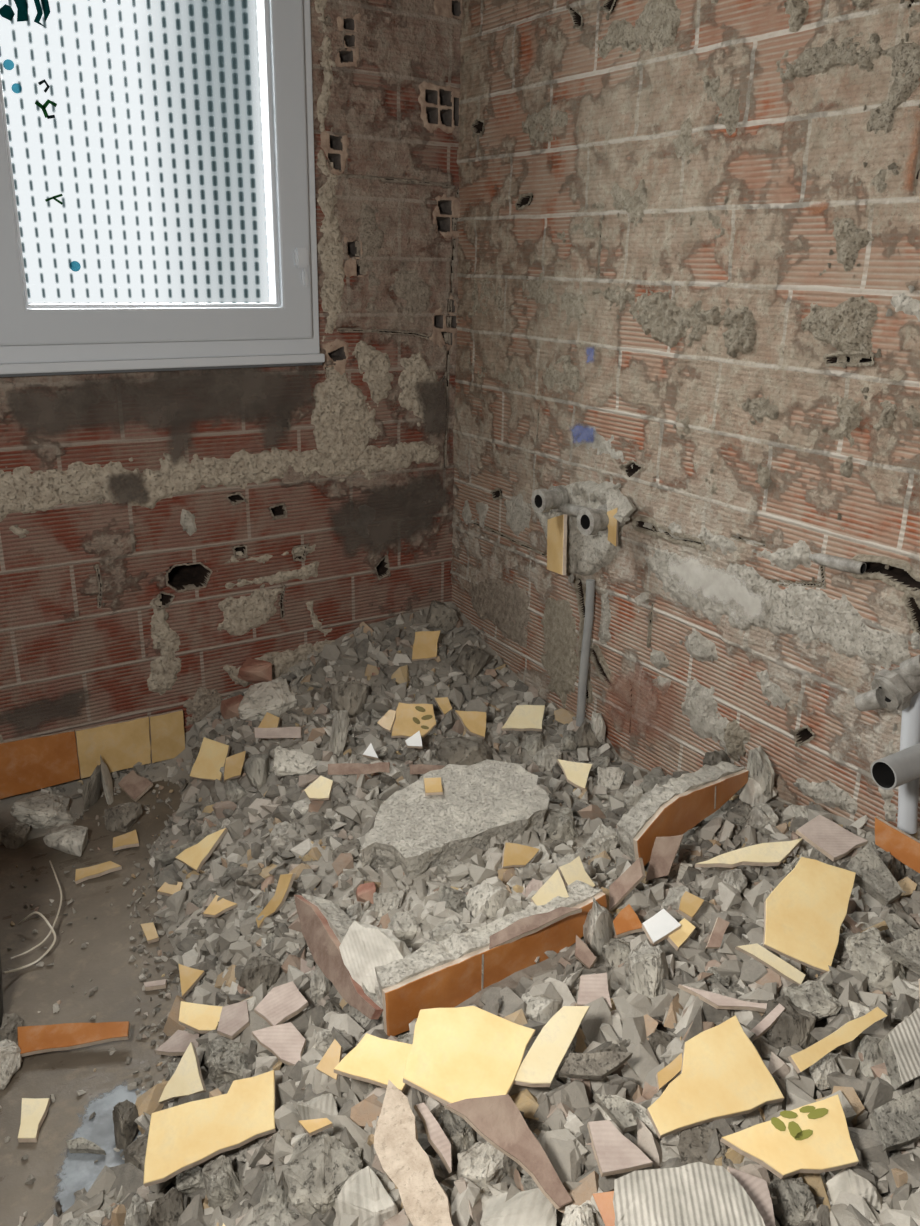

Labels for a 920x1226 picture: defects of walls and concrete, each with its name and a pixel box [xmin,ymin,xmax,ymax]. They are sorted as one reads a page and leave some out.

crack [900,0,914,10]
spalling [418,81,484,137]
spalling [320,127,350,176]
crack [912,146,920,195]
damp [9,367,317,463]
damp [417,379,448,437]
spalling [619,460,643,478]
crack [632,516,766,551]
spalling [152,561,218,620]
crack [770,554,920,634]
crack [645,599,654,648]
spalling [790,725,815,747]